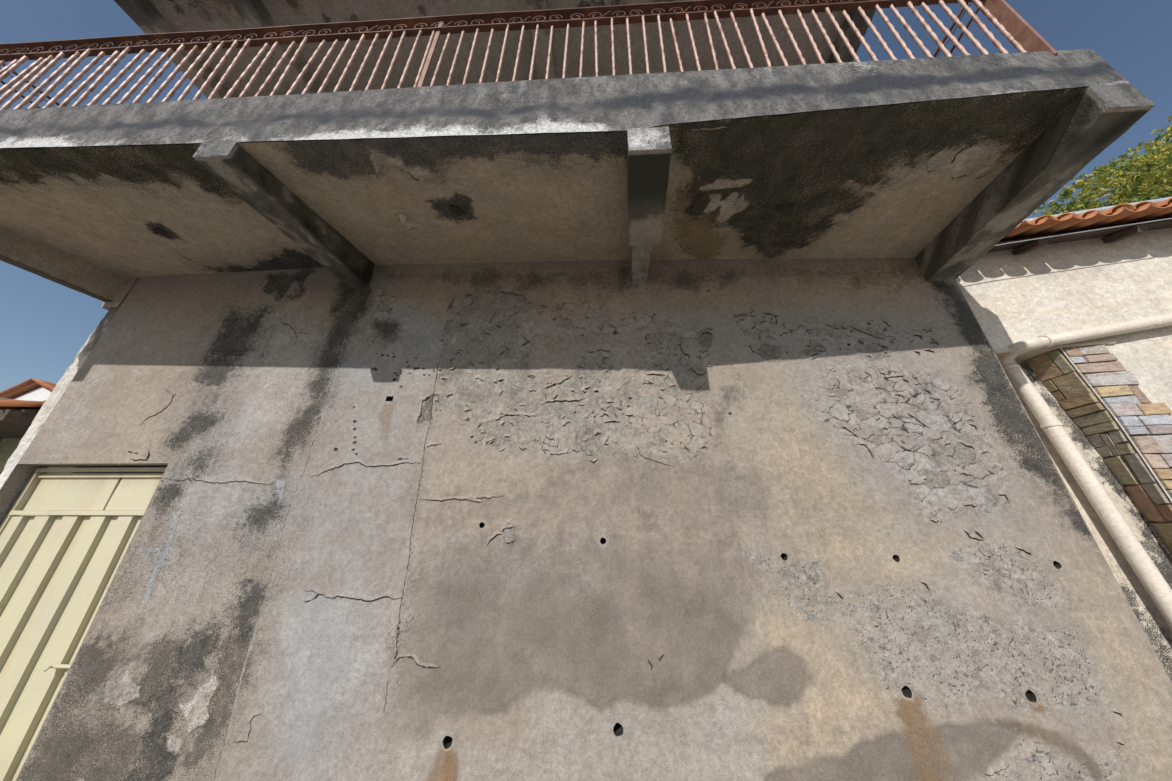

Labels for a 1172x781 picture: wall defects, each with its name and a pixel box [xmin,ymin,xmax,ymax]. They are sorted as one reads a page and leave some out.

damp [0,144,255,219]
damp [260,131,627,224]
damp [668,87,1085,259]
damp [145,221,323,387]
damp [17,571,274,781]
damp [145,408,224,602]
crack [127,325,505,781]
damp [234,280,403,547]
damp [438,579,806,712]
peeling [716,307,1131,781]